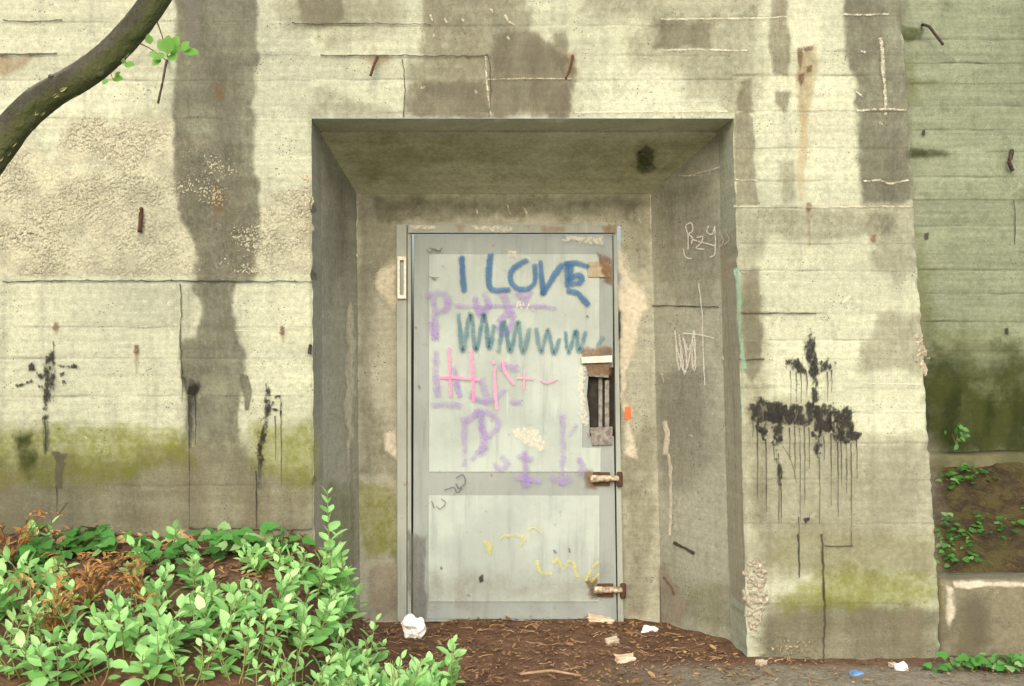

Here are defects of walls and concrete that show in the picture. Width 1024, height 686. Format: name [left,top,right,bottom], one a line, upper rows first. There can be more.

water stain [405,0,573,119]
corrosion [798,46,812,84]
water stain [839,0,913,208]
water stain [0,0,313,537]
water stain [752,371,931,571]
spalling [742,558,770,637]
crack [797,531,853,659]